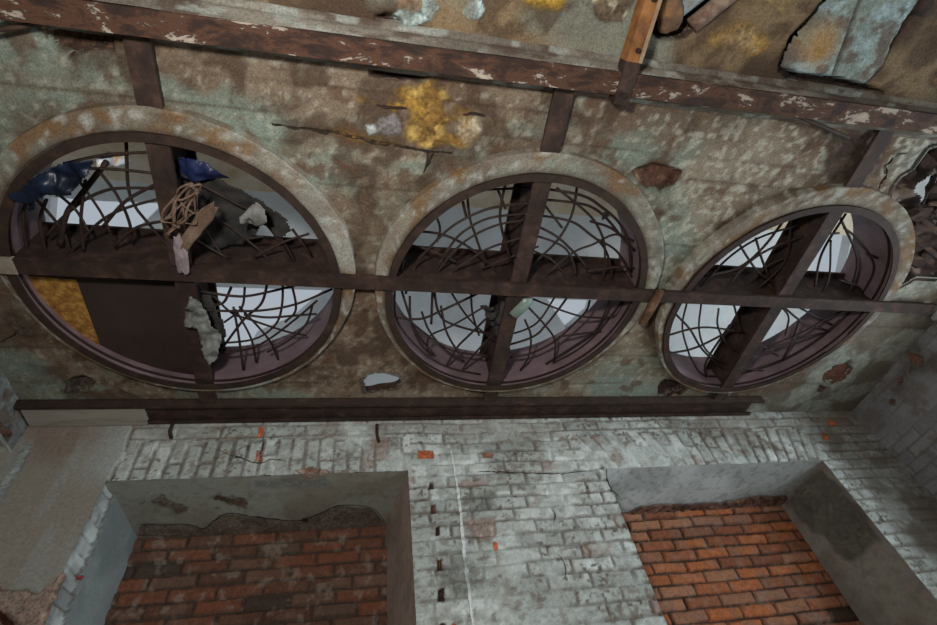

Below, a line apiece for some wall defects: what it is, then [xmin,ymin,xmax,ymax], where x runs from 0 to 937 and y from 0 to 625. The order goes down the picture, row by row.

peeling [374,0,439,27]
rust [704,23,771,55]
crack [377,102,407,110]
water stain [366,81,480,149]
crack [463,109,485,117]
crack [271,123,452,172]
spalling [632,162,682,189]
spalling [903,203,937,273]
spalling [817,362,852,392]
spalling [0,572,84,625]